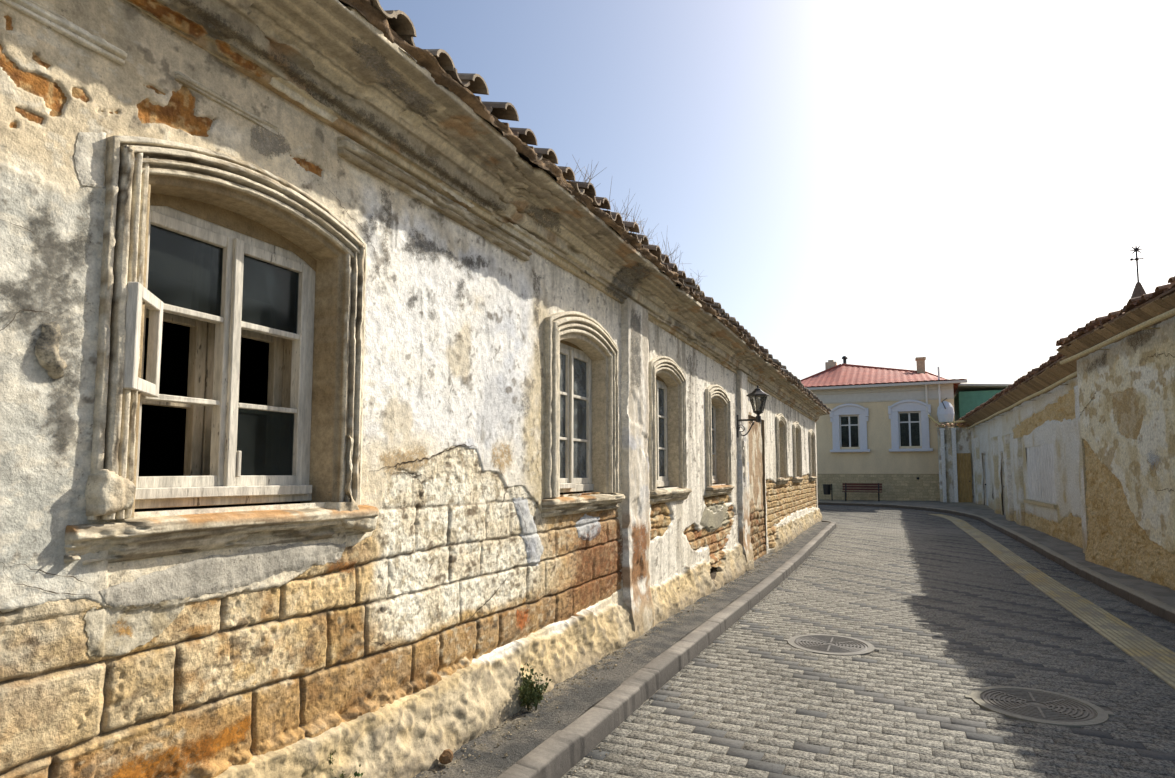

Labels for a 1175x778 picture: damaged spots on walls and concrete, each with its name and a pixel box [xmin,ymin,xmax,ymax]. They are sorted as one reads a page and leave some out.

peeling [0,44,89,128]
peeling [136,85,216,137]
damp [361,190,391,281]
damp [405,231,489,300]
damp [0,193,93,461]
crack [376,369,474,508]
crack [1,562,92,595]
flaking render [0,446,622,778]
flaking render [650,502,671,540]
flaking render [683,494,734,580]
flaking render [766,474,817,548]
flaking render [1013,439,1175,590]